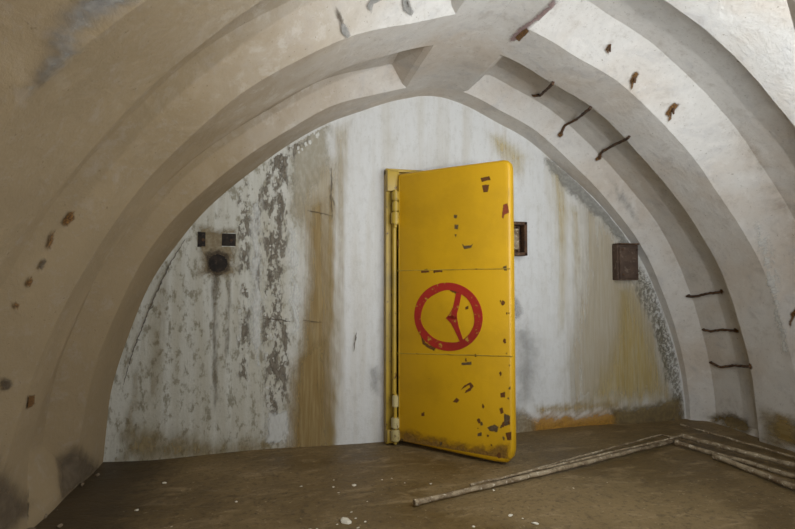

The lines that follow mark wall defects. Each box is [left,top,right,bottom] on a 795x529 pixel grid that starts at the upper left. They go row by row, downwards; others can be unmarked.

spalling [337,10,350,38]
spalling [403,0,413,15]
leakage [241,170,335,451]
leakage [547,159,684,424]